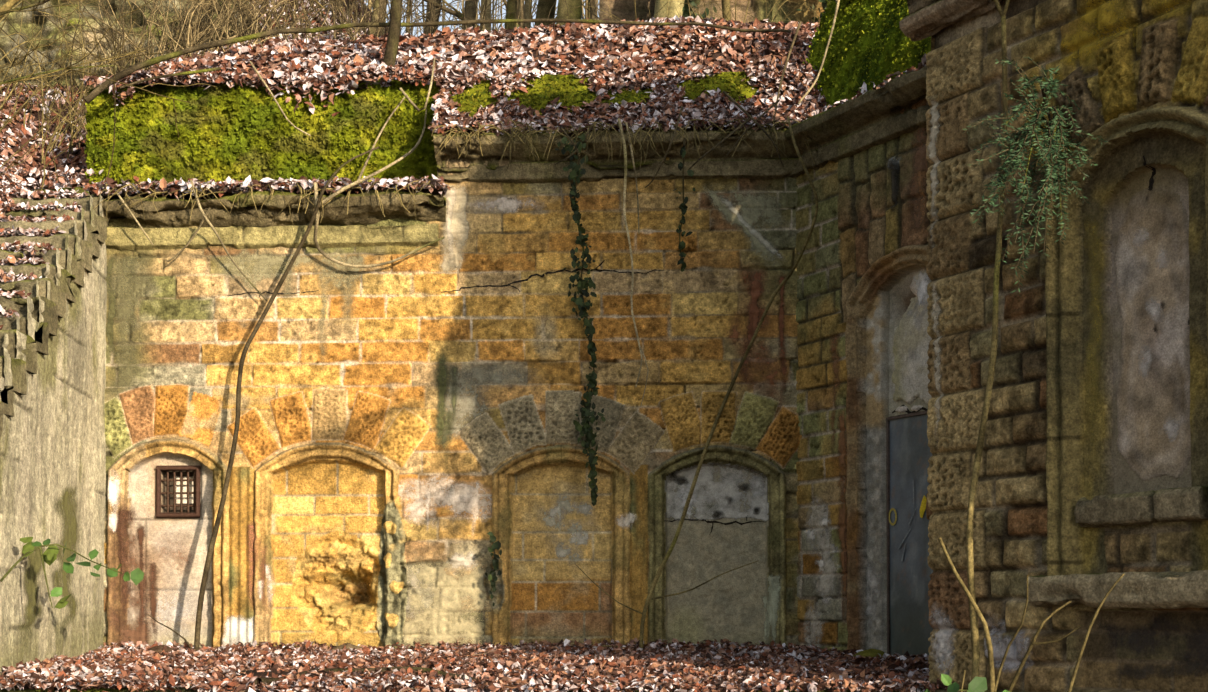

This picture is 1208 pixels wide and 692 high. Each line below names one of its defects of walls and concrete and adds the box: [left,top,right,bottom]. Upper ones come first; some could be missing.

rust [728,270,787,405]
flaking render [892,273,932,413]
flaking render [292,499,505,650]
crack [664,508,764,534]